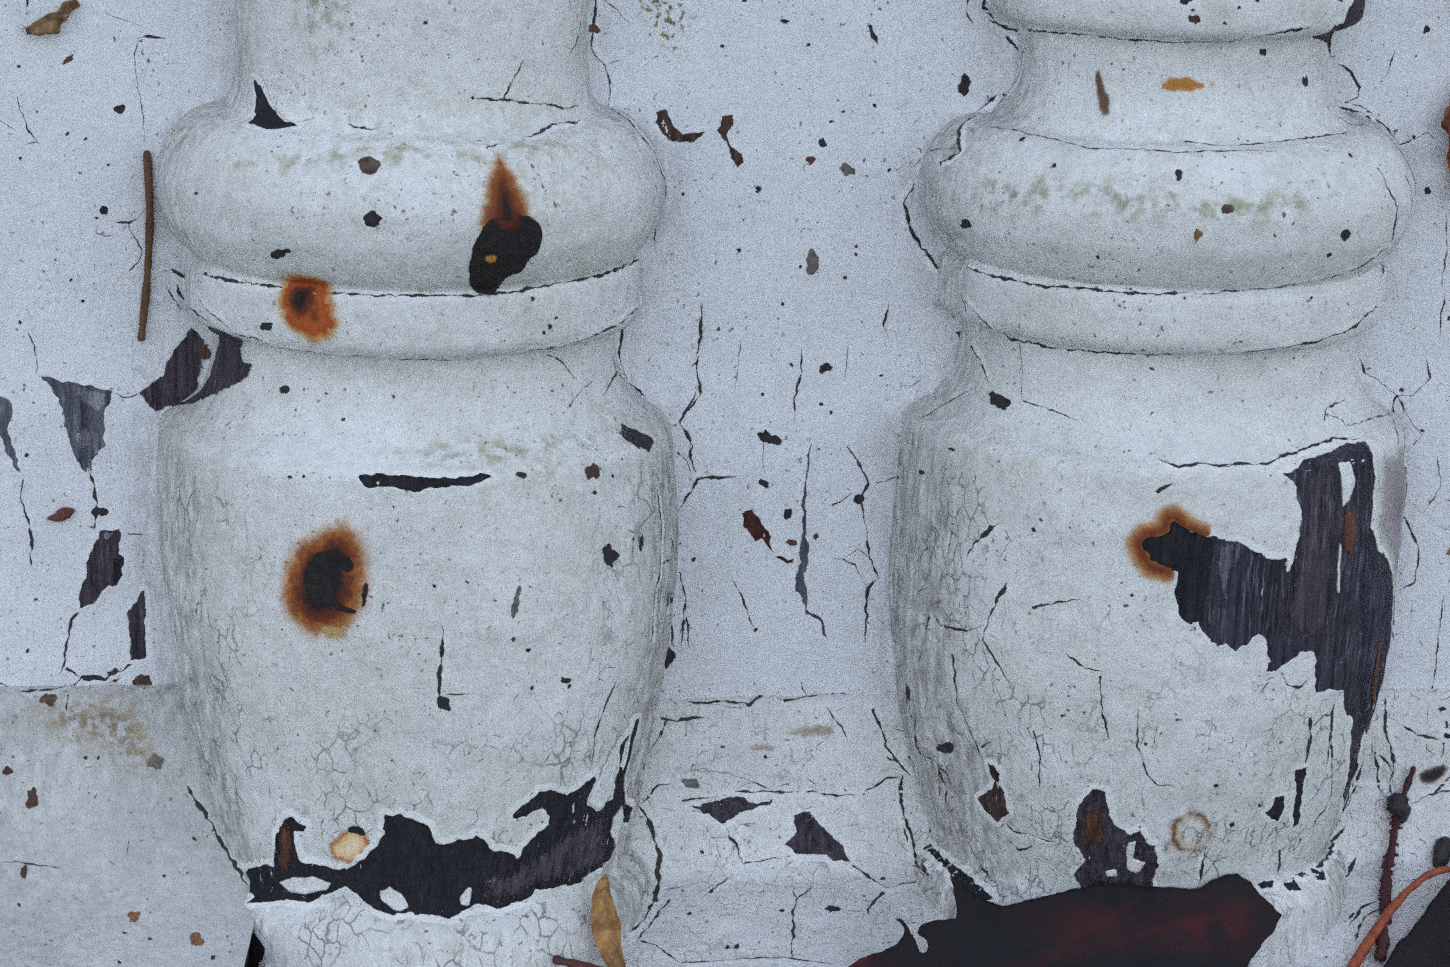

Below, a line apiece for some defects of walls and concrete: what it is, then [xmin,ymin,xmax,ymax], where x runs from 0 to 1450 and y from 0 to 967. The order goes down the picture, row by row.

rust [1162,77,1204,91]
rust [469,158,543,295]
rust [279,275,337,342]
peeling [140,326,251,411]
peeling [31,370,118,477]
peeling [353,468,498,499]
crack [327,0,1450,967]
rust [282,525,368,638]
rust [1127,505,1211,582]
peeling [1142,437,1406,833]
peeling [240,713,642,926]
peeling [1067,783,1166,888]